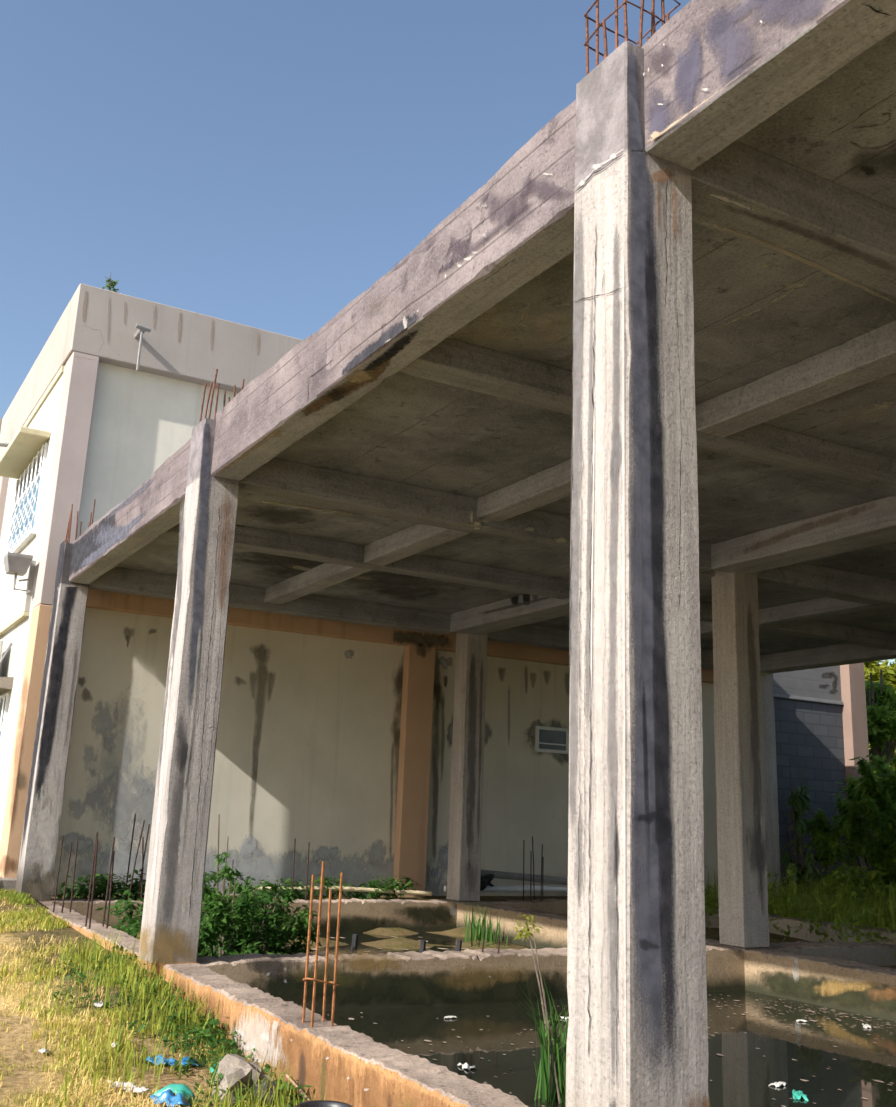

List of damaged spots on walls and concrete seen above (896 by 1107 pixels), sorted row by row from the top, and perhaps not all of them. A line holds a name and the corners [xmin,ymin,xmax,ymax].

spalling [303,314,418,416]
water stain [438,241,476,277]
water stain [483,173,560,222]
water stain [554,225,595,821]
water stain [608,11,748,1074]
water stain [21,480,153,902]
water stain [237,645,271,836]
water stain [393,632,452,852]
crack [569,225,624,1082]